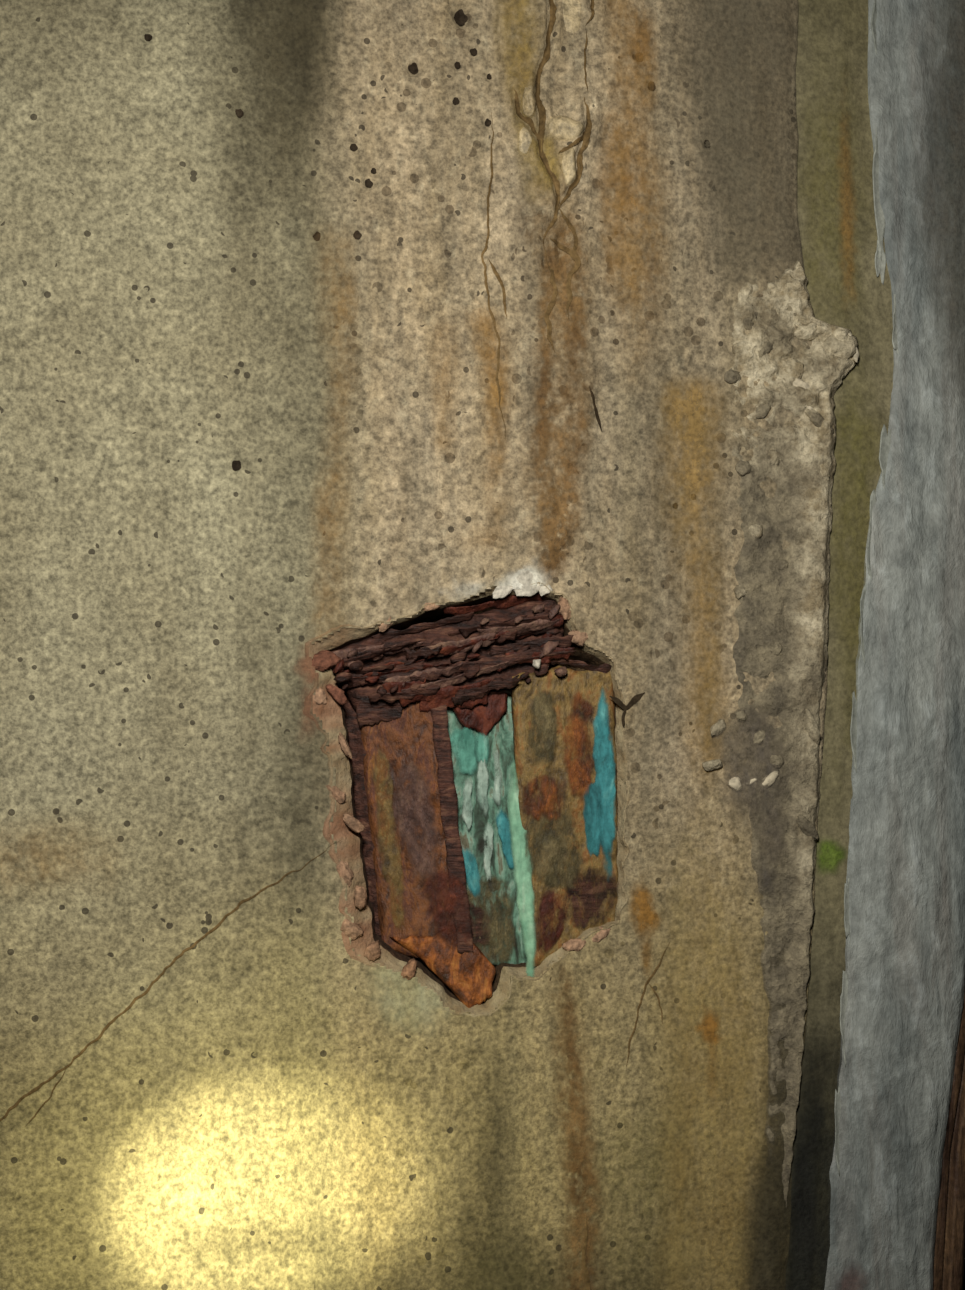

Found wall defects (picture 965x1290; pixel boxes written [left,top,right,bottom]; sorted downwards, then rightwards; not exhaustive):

crack [481,0,595,440]
corrosion [536,217,586,571]
crack [589,386,602,431]
crack [0,840,341,1124]
spalling [303,582,630,1017]
corrosion [331,593,618,1008]